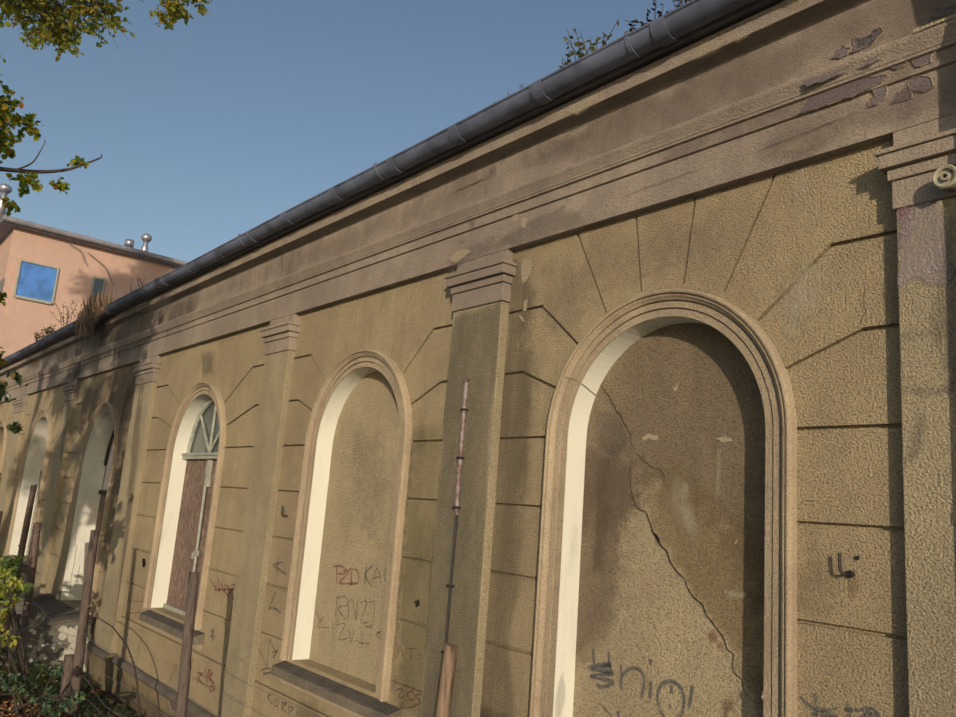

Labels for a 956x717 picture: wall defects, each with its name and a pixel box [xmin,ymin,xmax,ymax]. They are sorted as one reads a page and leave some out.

peeling [802,27,885,86]
peeling [898,201,954,286]
crack [566,377,761,709]
peeling [0,624,92,672]